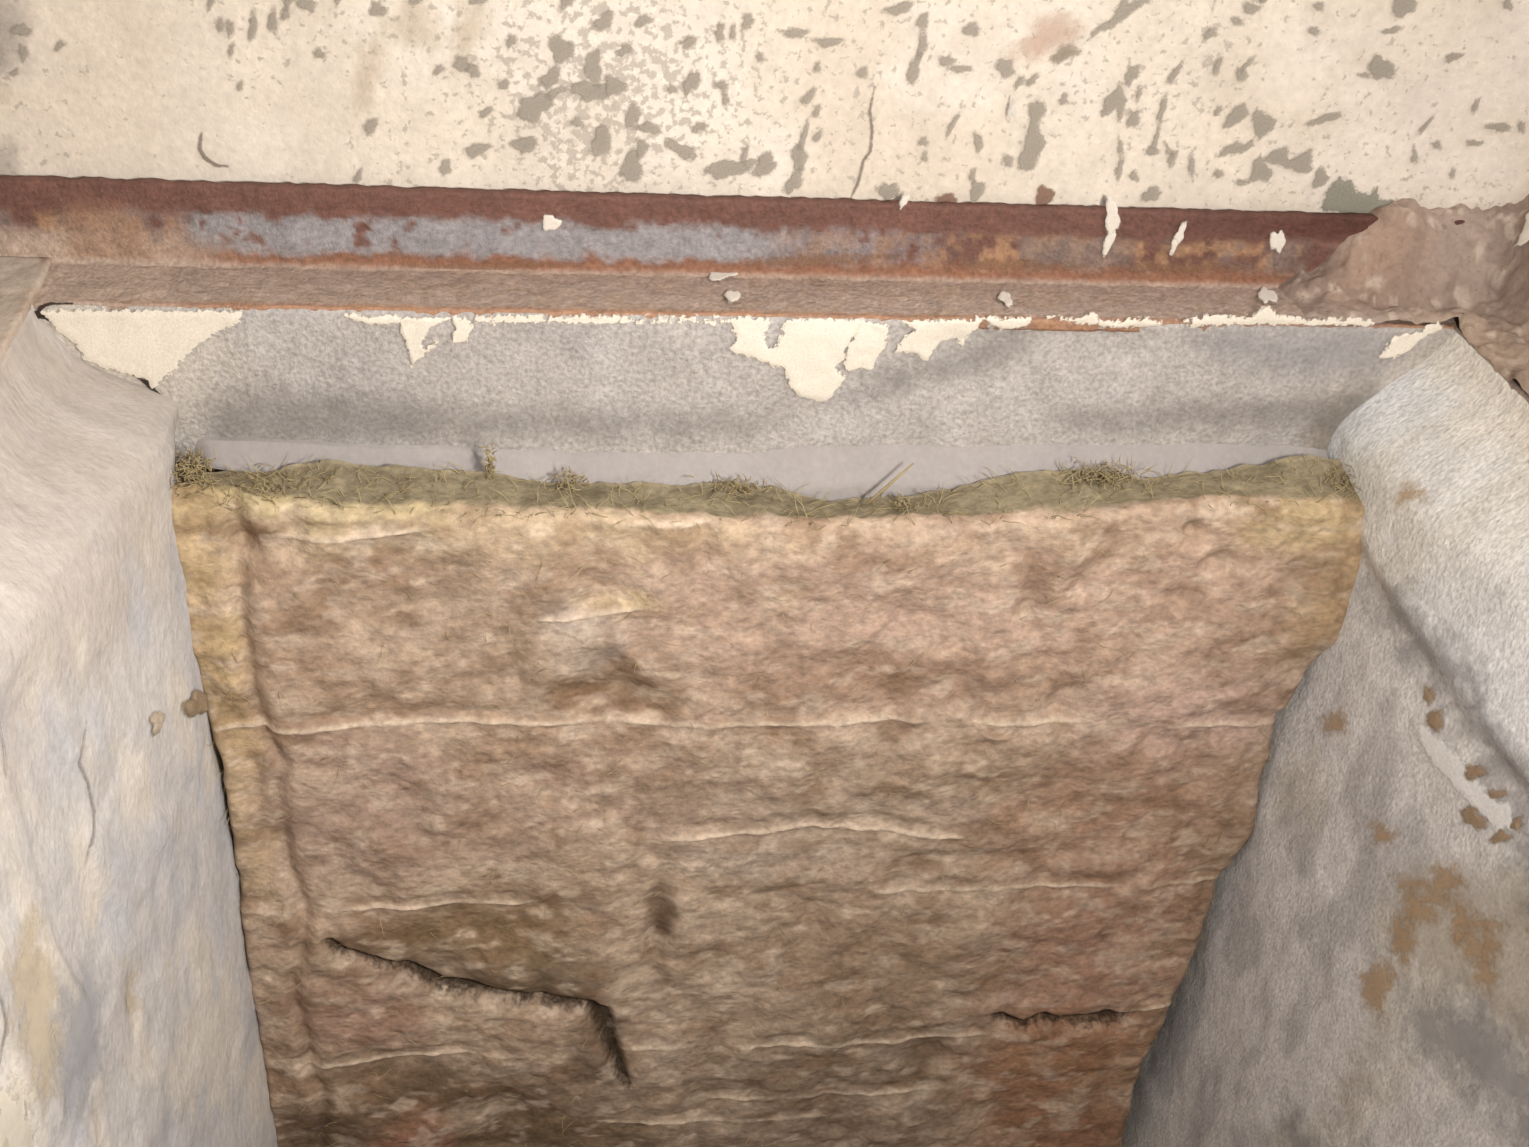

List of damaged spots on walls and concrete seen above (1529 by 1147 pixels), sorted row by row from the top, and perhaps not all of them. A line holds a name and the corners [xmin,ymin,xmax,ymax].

peeling [340,306,1375,402]
peeling [1379,321,1443,359]
rust [1361,865,1501,1014]
peeling [0,1075,35,1147]
leakage [1417,1003,1529,1140]